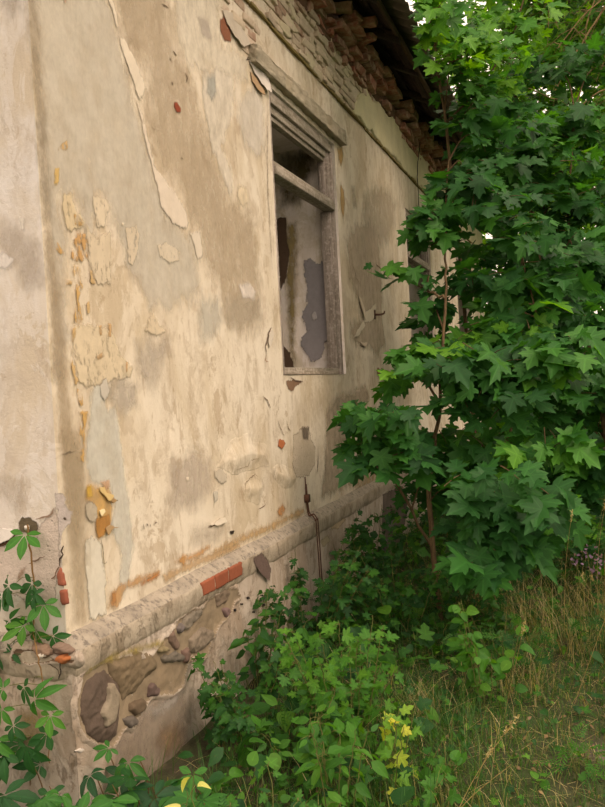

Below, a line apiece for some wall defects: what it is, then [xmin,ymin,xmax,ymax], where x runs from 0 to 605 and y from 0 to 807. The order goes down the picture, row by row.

water stain [176,0,264,207]
flaking render [220,0,367,110]
peeling [34,0,203,593]
spalling [348,225,385,352]
spalling [278,386,368,497]
spalling [9,562,250,753]